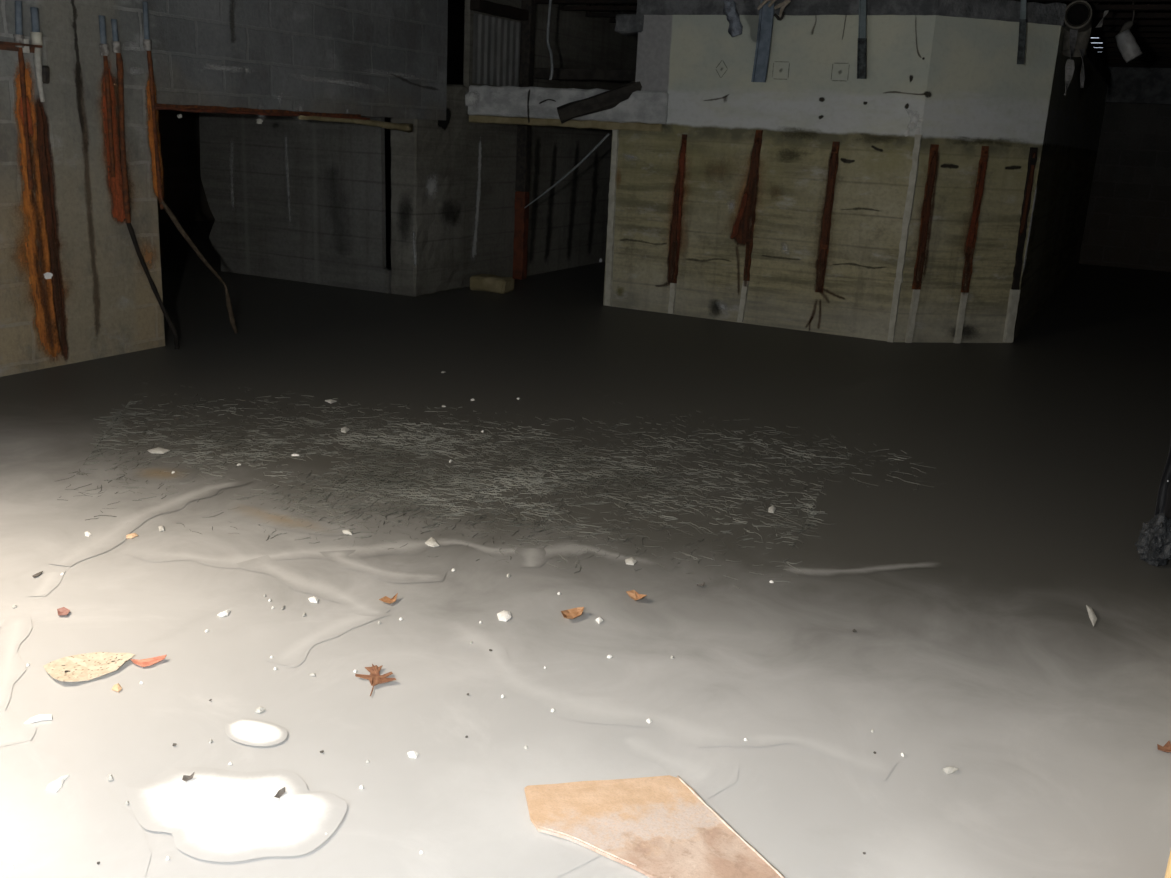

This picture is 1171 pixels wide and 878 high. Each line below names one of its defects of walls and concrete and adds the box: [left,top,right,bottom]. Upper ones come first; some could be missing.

corrosion [14,63,68,360]
corrosion [101,64,131,223]
corrosion [146,77,163,197]
corrosion [656,139,686,287]
corrosion [731,138,760,293]
corrosion [806,148,845,331]
corrosion [915,151,939,288]
corrosion [963,151,988,294]
corrosion [1019,152,1036,234]